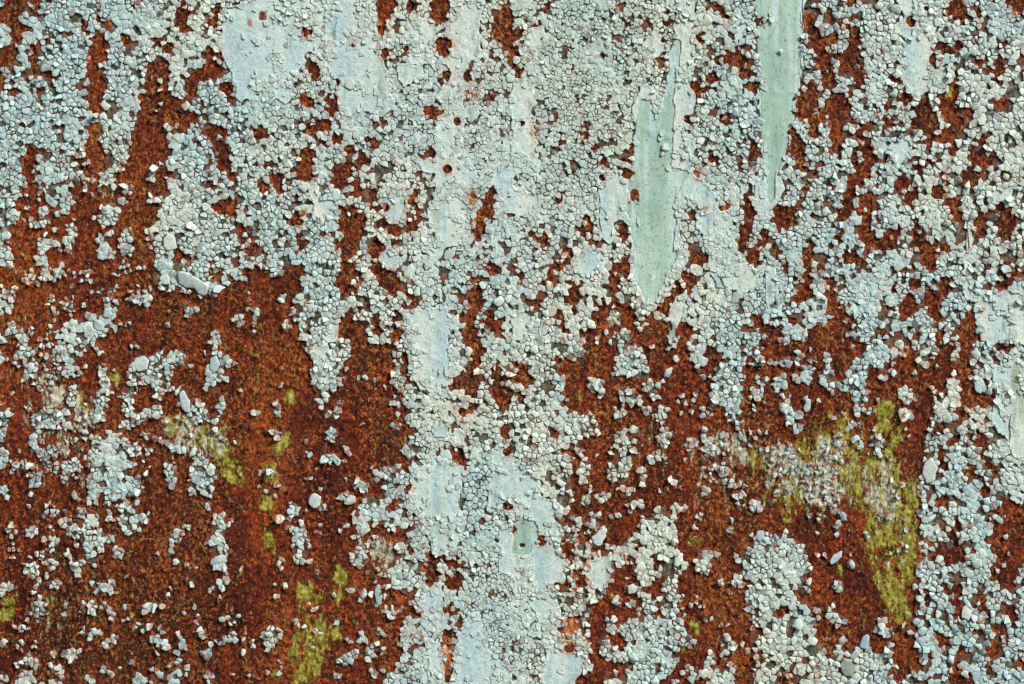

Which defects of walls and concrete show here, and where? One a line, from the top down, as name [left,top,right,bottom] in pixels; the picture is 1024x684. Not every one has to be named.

rust [428,0,496,104]
peeling [21,217,94,287]
peeling [94,227,146,277]
rust [0,0,468,684]
rust [448,0,1024,684]
peeling [595,312,673,499]
peeling [770,373,811,434]
peeling [0,284,237,684]
peeling [683,426,763,513]
peeling [273,487,326,600]
peeling [182,604,283,684]
peeling [680,646,736,684]